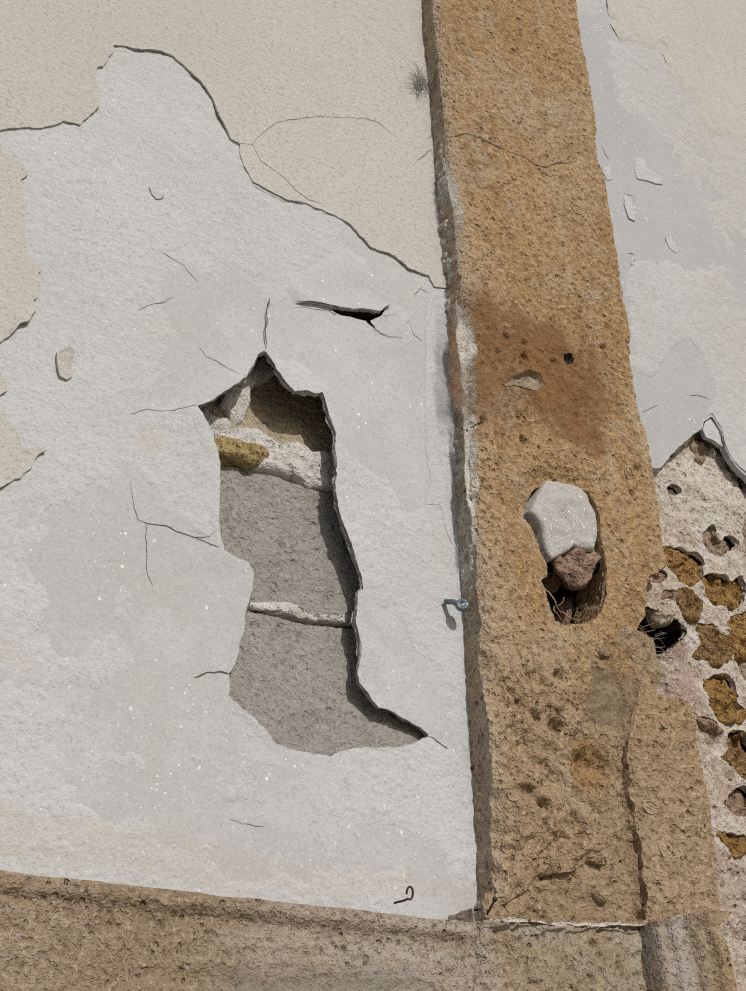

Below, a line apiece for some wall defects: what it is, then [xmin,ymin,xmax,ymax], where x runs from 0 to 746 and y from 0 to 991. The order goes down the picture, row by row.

crack [234,116,396,204]
peeling [576,0,746,256]
crack [130,483,218,586]
peeling [0,46,480,915]
spalling [483,255,746,991]